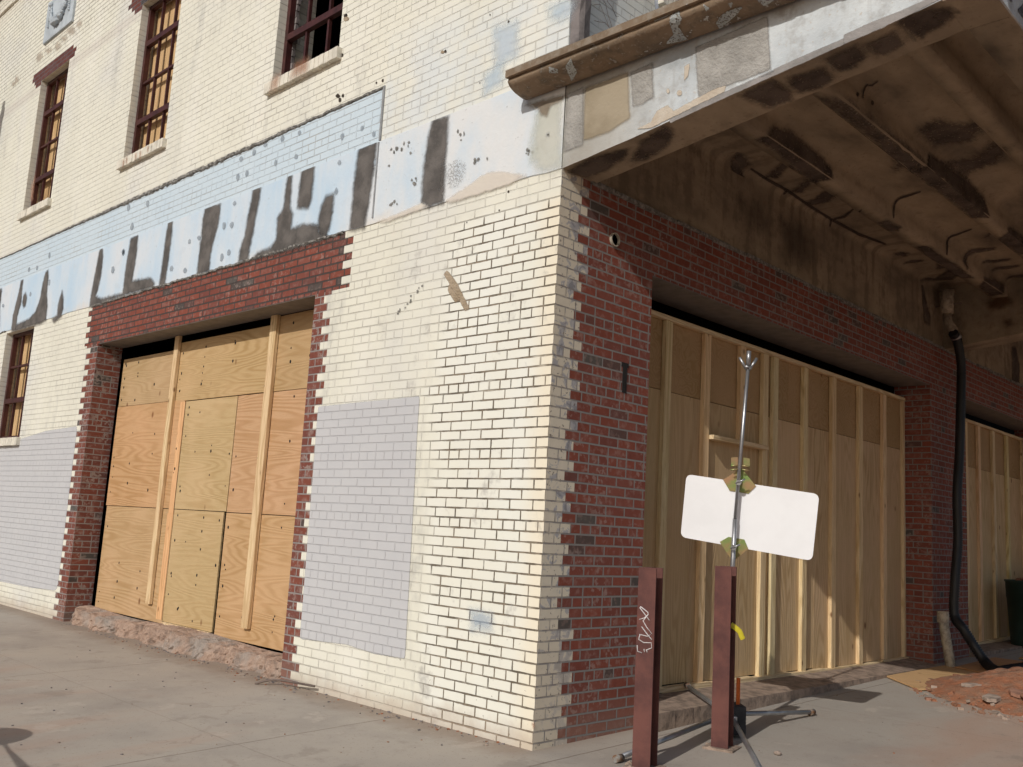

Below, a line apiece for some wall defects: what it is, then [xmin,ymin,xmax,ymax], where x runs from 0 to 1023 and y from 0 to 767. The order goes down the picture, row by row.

peeling [549,59,577,81]
peeling [638,0,937,129]
peeling [583,73,630,140]